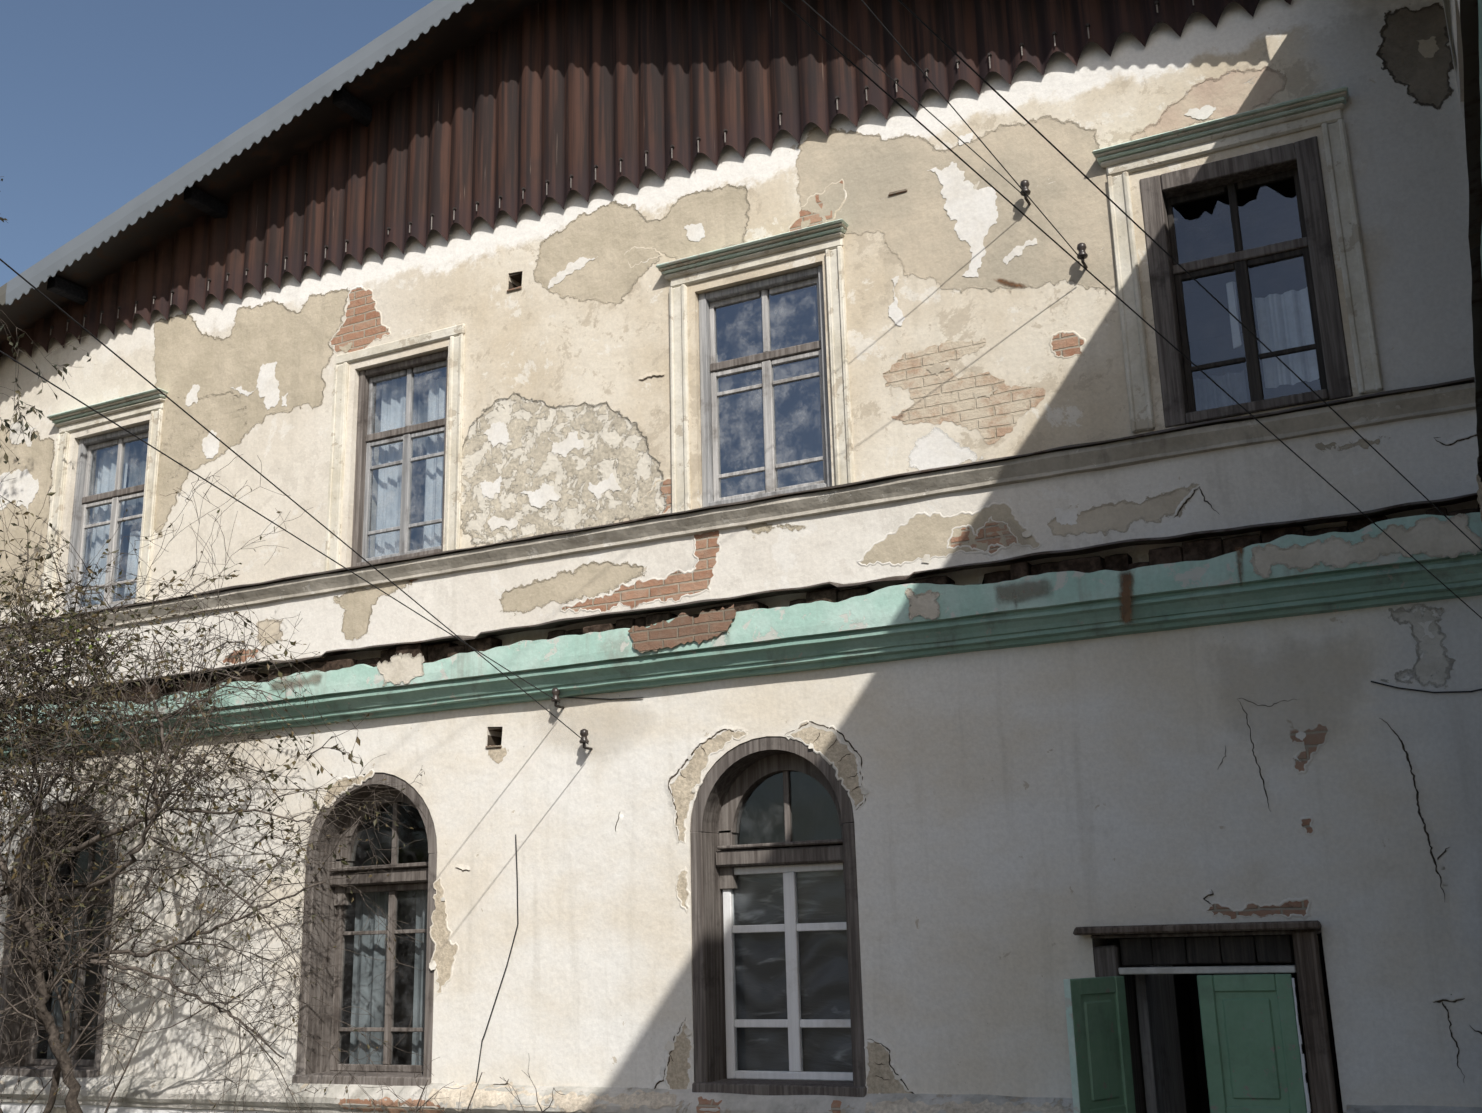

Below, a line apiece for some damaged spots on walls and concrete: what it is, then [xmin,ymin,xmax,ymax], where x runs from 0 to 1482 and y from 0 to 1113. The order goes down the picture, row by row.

spalling [1376,2,1454,110]
peeling [533,184,750,306]
peeling [153,285,391,539]
peeling [460,392,672,547]
flaking render [883,338,1046,445]
flaking render [499,530,736,653]
spalling [669,728,748,844]
spalling [785,720,870,810]
crack [1218,698,1296,811]
crack [1380,715,1450,903]
spalling [338,1019,722,1113]
crack [1431,993,1482,1082]